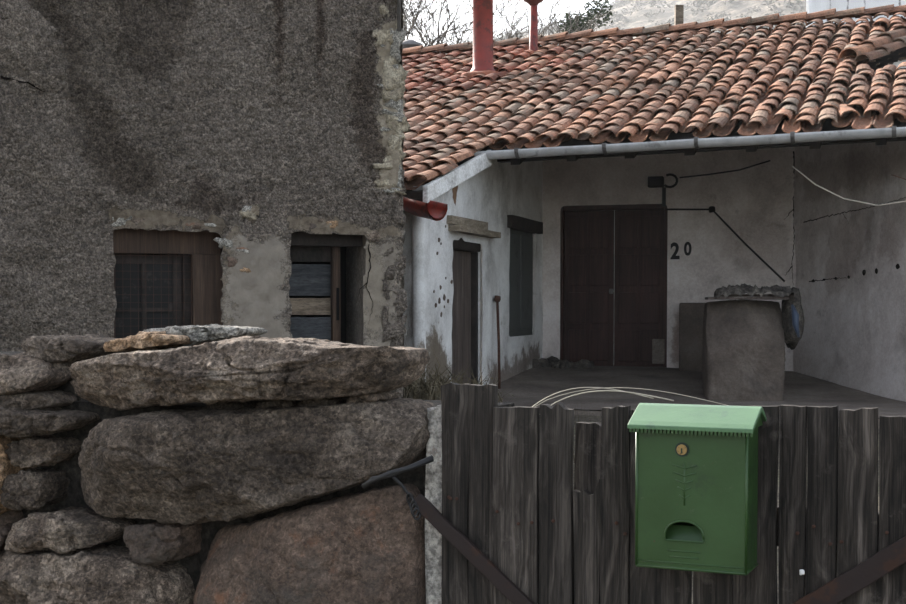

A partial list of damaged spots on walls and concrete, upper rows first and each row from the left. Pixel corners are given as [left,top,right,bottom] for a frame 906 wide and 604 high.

crack [1,76,44,92]
flaking render [371,4,410,195]